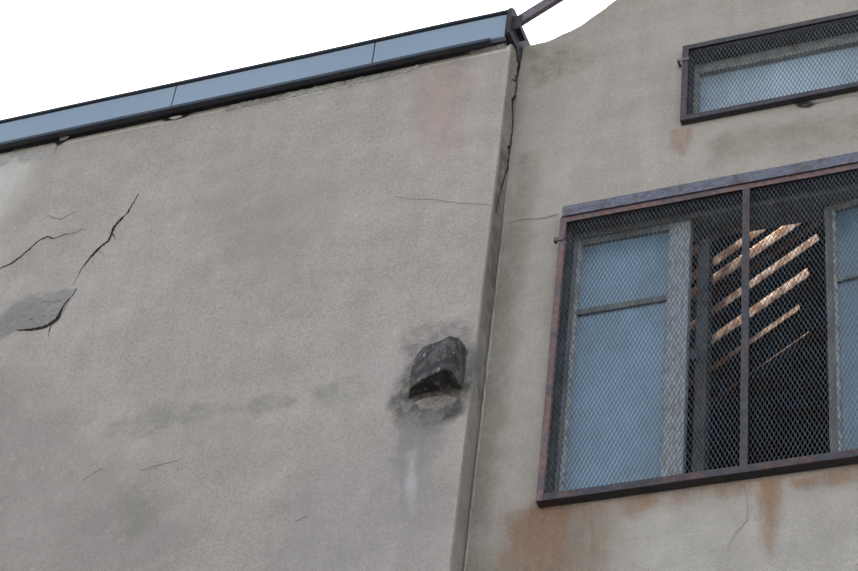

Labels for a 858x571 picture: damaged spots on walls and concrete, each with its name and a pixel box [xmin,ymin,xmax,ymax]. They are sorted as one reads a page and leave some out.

crack [396,63,557,223]
spalling [0,289,74,338]
crack [0,193,139,336]
damp [0,50,531,571]
rust [760,479,779,540]